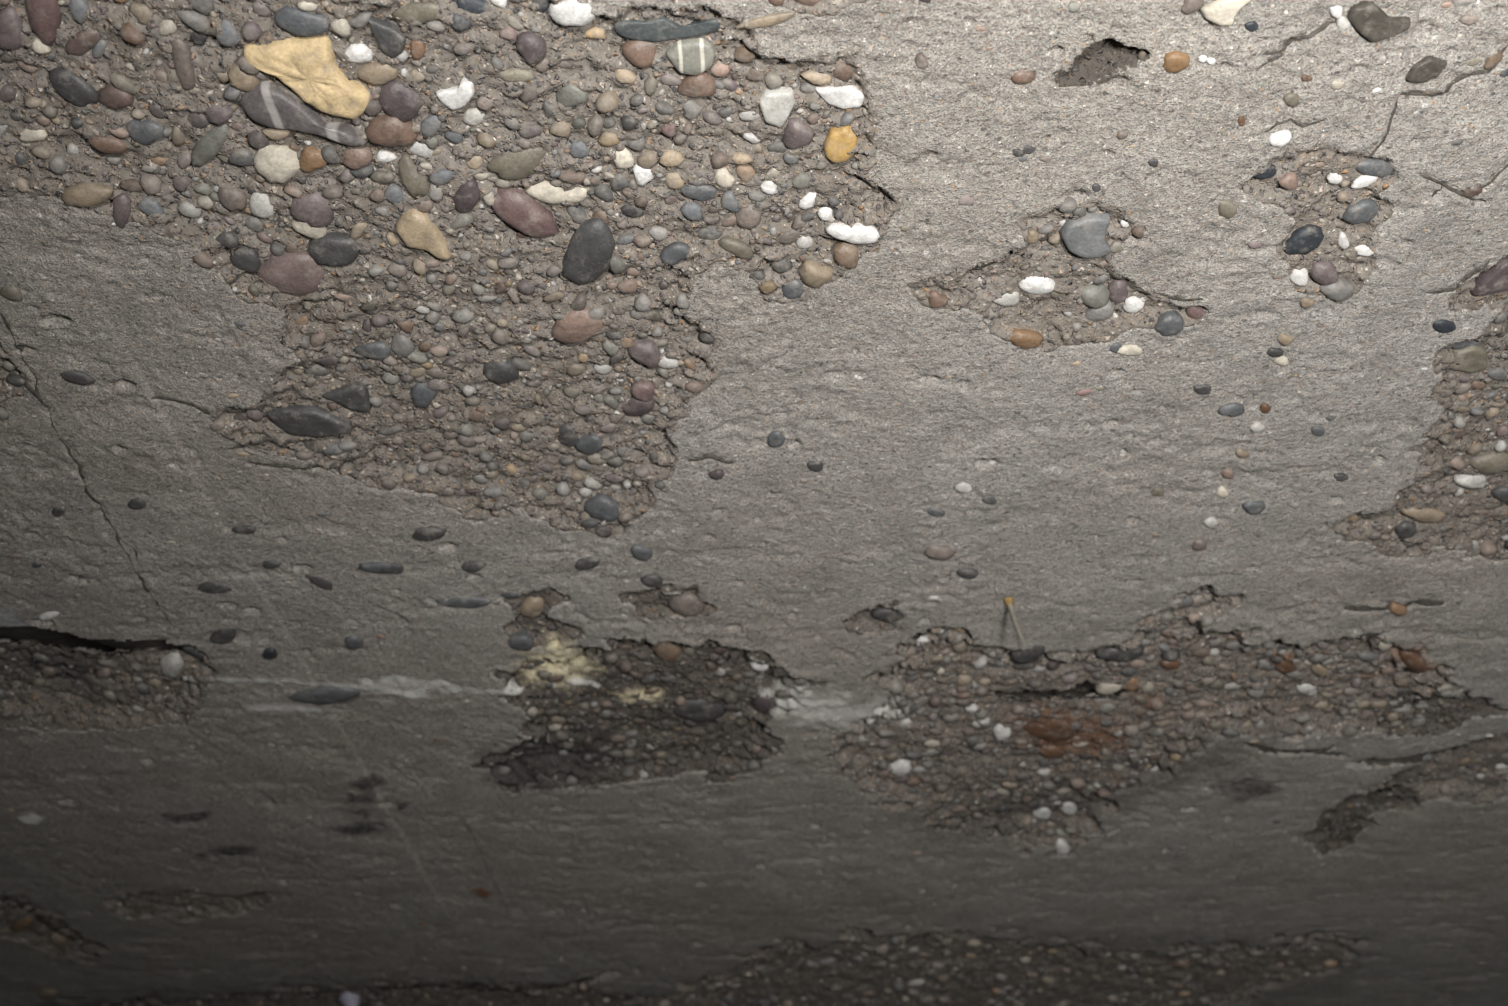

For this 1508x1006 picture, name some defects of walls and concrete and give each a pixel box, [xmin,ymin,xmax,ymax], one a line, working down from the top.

spalling [0,0,904,538]
spalling [906,196,1207,354]
spalling [1239,146,1398,308]
crack [0,313,209,658]
spalling [1332,256,1508,561]
spalling [0,641,219,733]
spalling [501,588,584,651]
spalling [618,574,717,620]
spalling [826,585,1508,859]